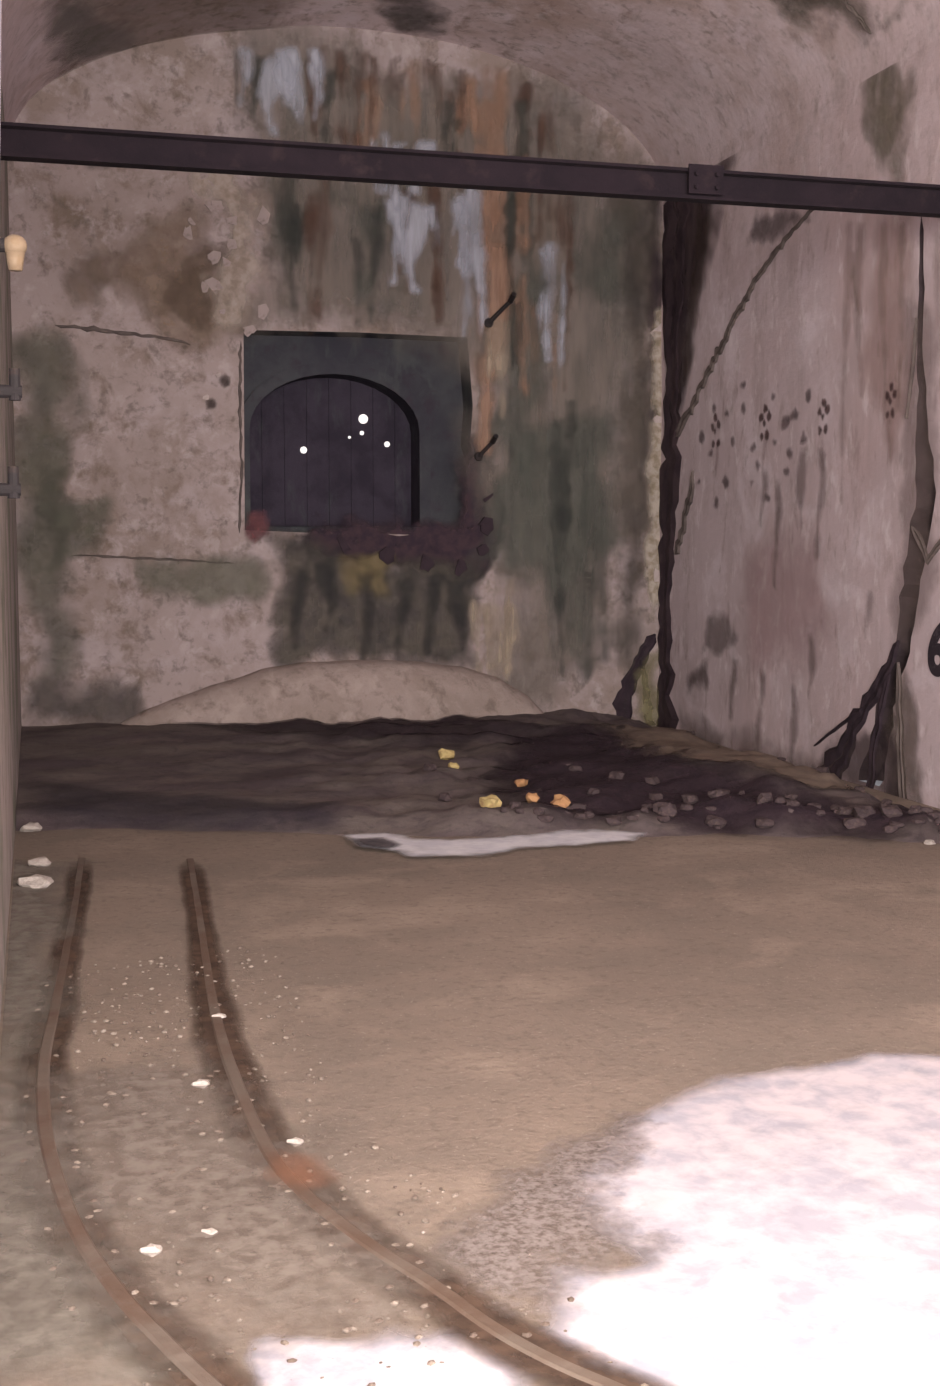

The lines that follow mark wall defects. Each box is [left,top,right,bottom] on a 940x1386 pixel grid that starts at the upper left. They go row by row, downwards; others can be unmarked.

water stain [389,0,438,31]
water stain [246,36,598,162]
water stain [12,338,138,723]
water stain [140,559,265,602]
water stain [273,178,712,692]
rust [479,190,528,452]
crack [612,201,814,729]
water stain [782,392,810,427]
crack [814,217,940,799]